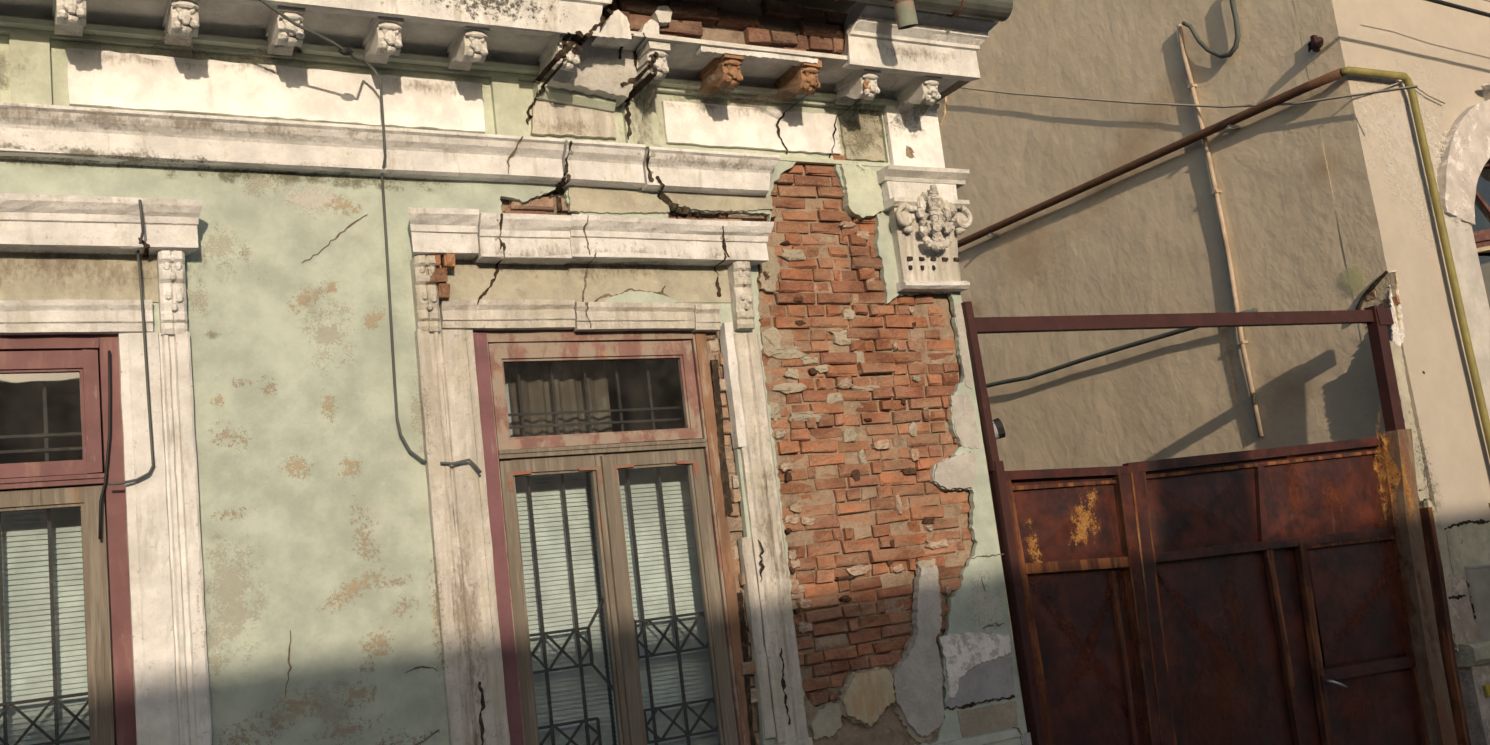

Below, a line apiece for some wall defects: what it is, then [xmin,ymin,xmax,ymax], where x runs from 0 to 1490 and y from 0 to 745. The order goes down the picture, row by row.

flaking render [591,0,847,55]
crack [507,4,730,297]
crack [302,214,368,263]
crack [477,213,506,305]
crack [549,141,669,328]
peeling [210,376,277,451]
flaking render [668,155,1018,745]
flaking render [1355,269,1490,651]
crack [284,630,292,697]
peeling [306,504,448,745]
crack [478,681,486,745]